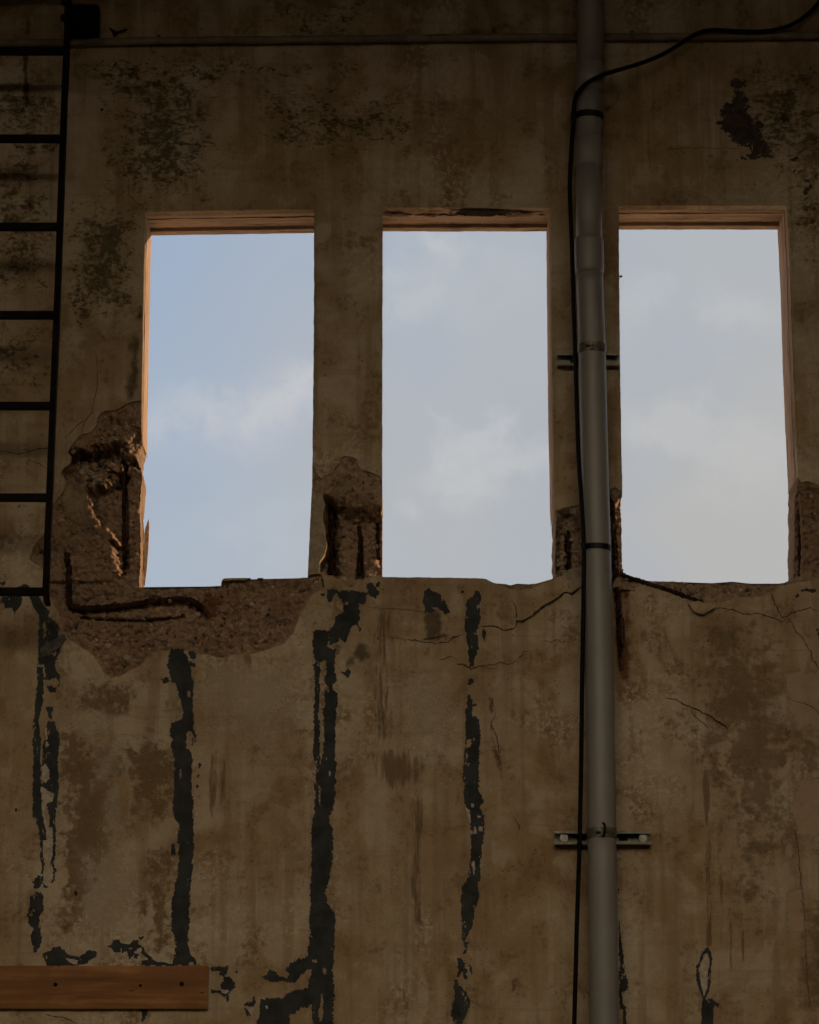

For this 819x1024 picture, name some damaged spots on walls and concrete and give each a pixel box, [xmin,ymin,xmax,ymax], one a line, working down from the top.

damp [716,67,819,247]
damp [0,596,225,966]
spalling [30,399,383,678]
damp [244,582,380,1024]
damp [450,590,486,1024]
crack [386,588,579,670]
spalling [495,505,582,590]
crack [666,698,728,731]
spalling [609,477,819,675]
crack [717,594,818,667]